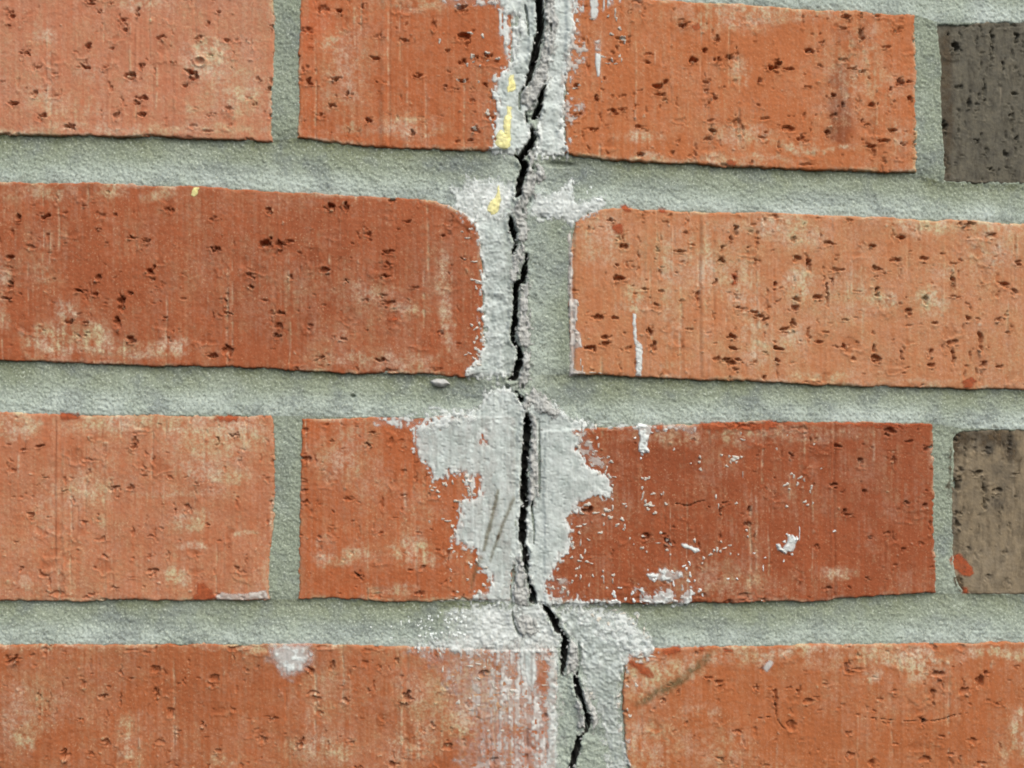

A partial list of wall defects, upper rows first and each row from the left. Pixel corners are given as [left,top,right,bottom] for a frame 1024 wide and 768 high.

crack [508,0,594,768]